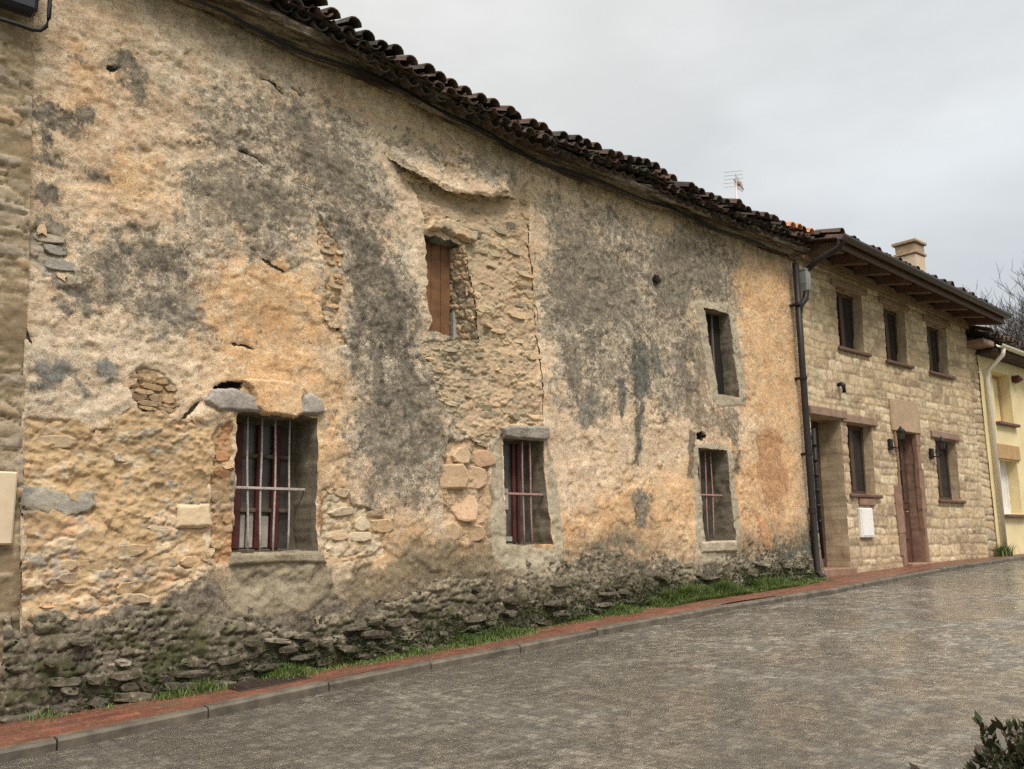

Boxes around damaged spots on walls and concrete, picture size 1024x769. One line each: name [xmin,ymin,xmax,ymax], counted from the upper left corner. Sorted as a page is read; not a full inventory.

leakage [32,94,95,170]
leakage [85,169,114,185]
flaking render [29,224,75,281]
leakage [95,232,212,327]
crack [261,258,284,272]
flaking render [317,220,345,346]
flaking render [402,172,544,542]
crack [526,225,544,416]
leakage [647,236,729,319]
leakage [618,378,645,466]
flaking render [19,367,234,630]
flaking render [320,487,394,567]